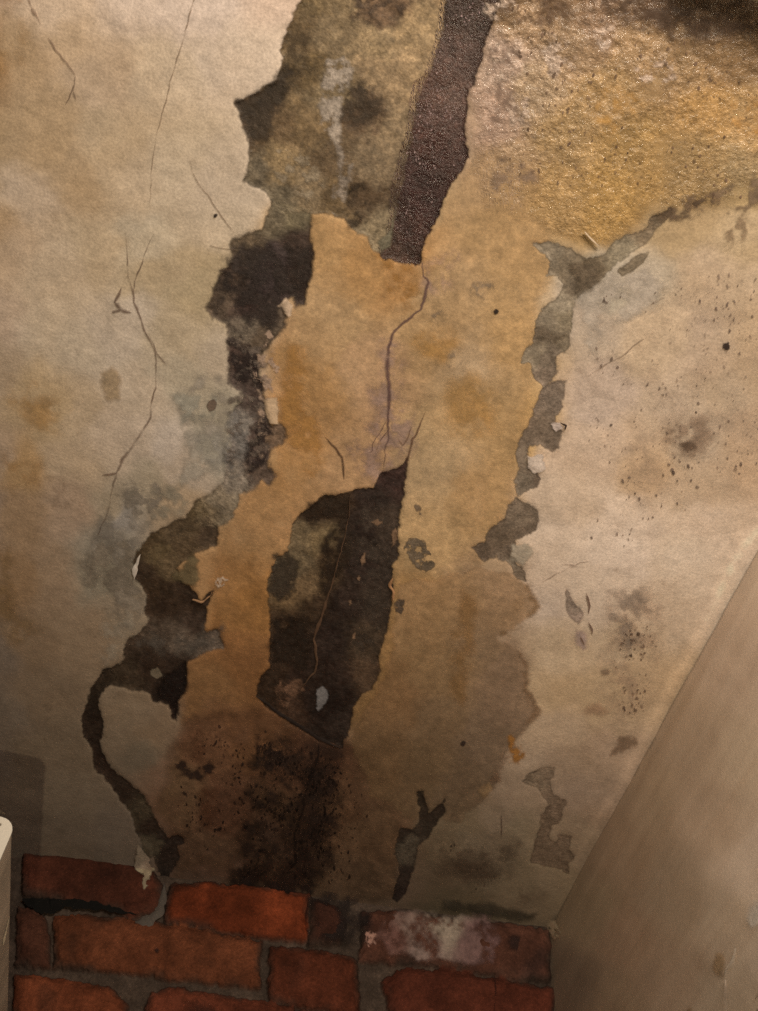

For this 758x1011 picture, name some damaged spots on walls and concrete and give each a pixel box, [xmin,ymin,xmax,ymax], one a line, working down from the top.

crack [112,241,164,362]
crack [371,263,429,468]
flaking render [82,0,499,902]
flaking render [523,767,575,873]
damp [365,901,534,964]